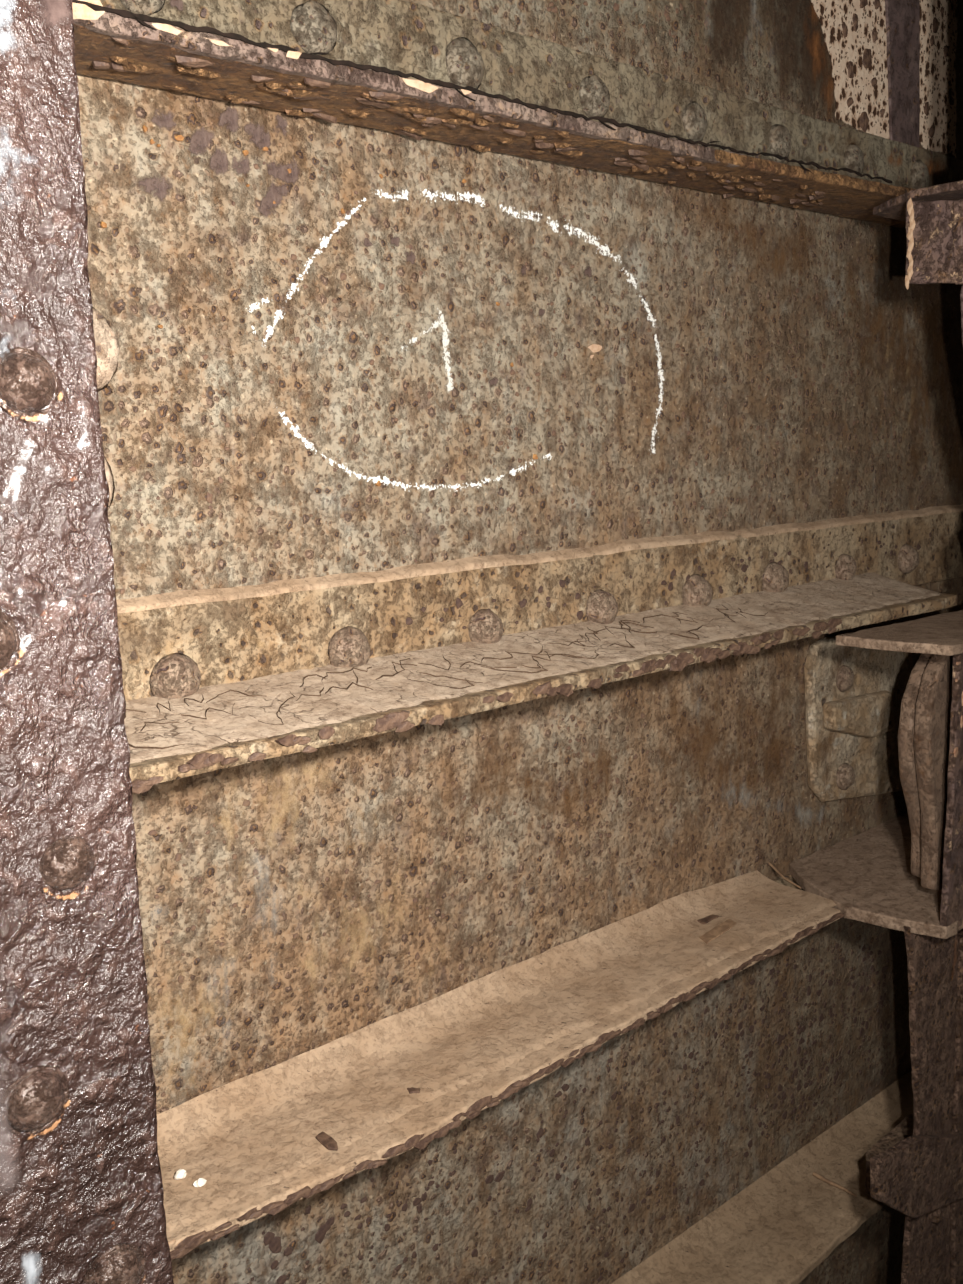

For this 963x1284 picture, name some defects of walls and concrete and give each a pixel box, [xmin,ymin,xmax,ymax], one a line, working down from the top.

corrosion [842,0,881,87]
corrosion [930,7,950,57]
peeling [811,0,890,139]
peeling [919,0,958,158]
corrosion [847,97,885,132]
corrosion [924,102,935,138]
corrosion [139,107,300,217]
corrosion [390,235,416,264]
corrosion [0,392,63,422]
crack [124,604,784,749]
corrosion [28,1100,71,1139]
leakage [24,1257,36,1284]